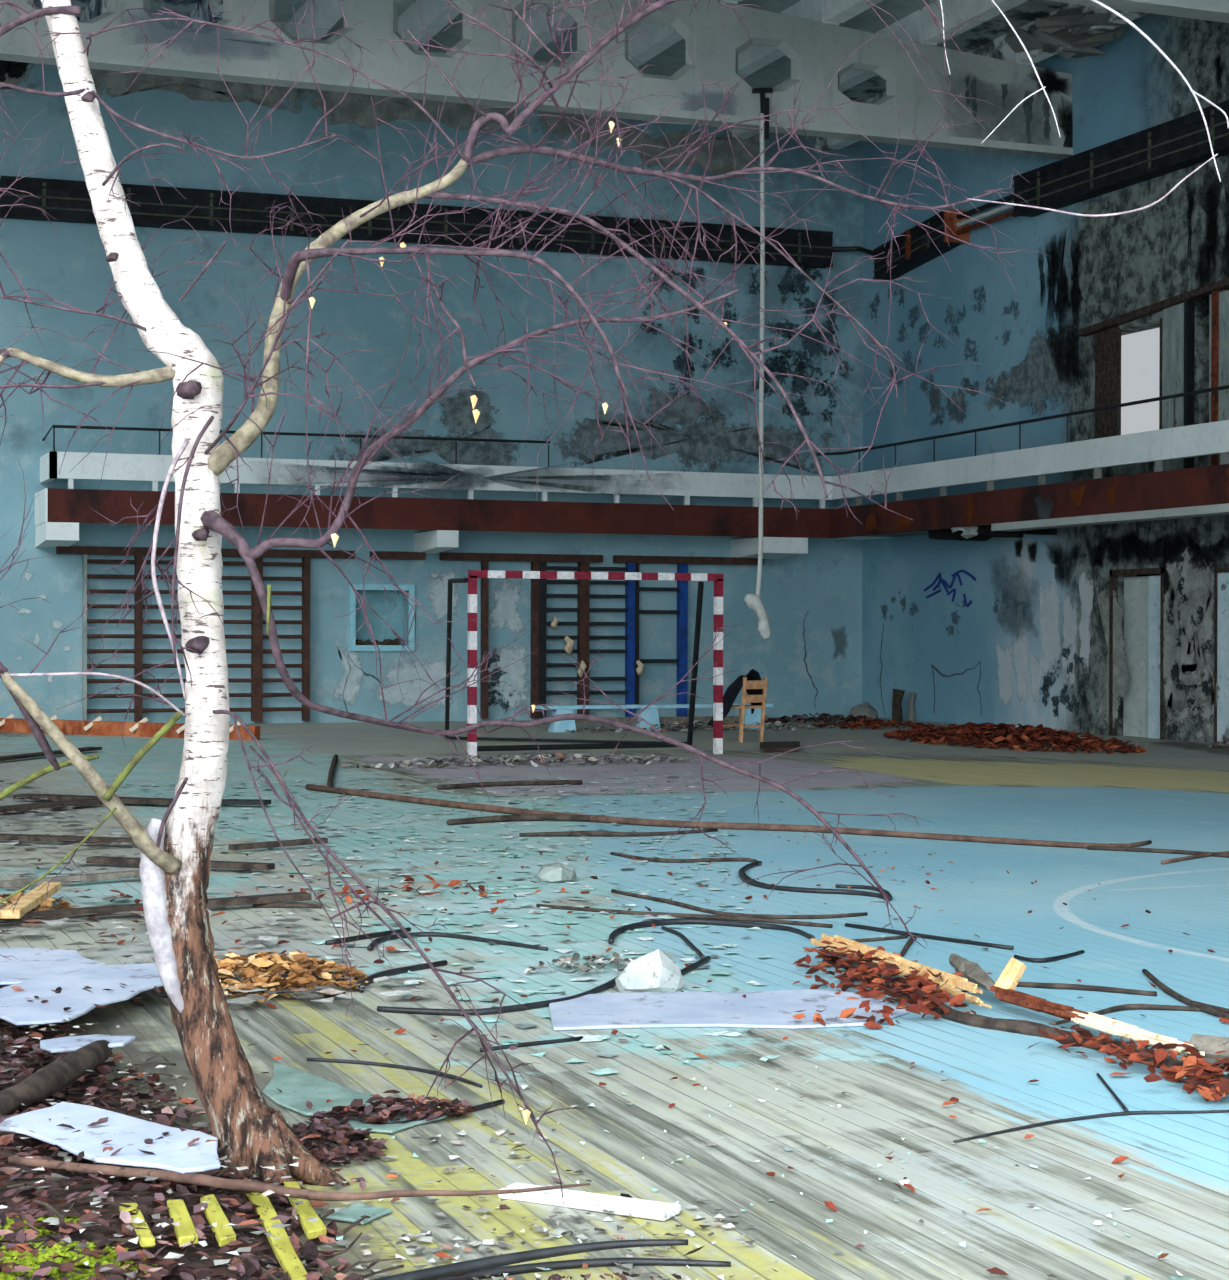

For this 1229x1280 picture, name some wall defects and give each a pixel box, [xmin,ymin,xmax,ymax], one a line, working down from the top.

spalling [1004,6,1133,60]
leakage [1187,174,1229,318]
leakage [1038,236,1084,384]
spalling [929,324,1073,423]
peeling [330,387,520,466]
peeling [546,388,832,474]
leakage [880,591,918,620]
leakage [993,530,1229,739]
spalling [1095,586,1129,728]